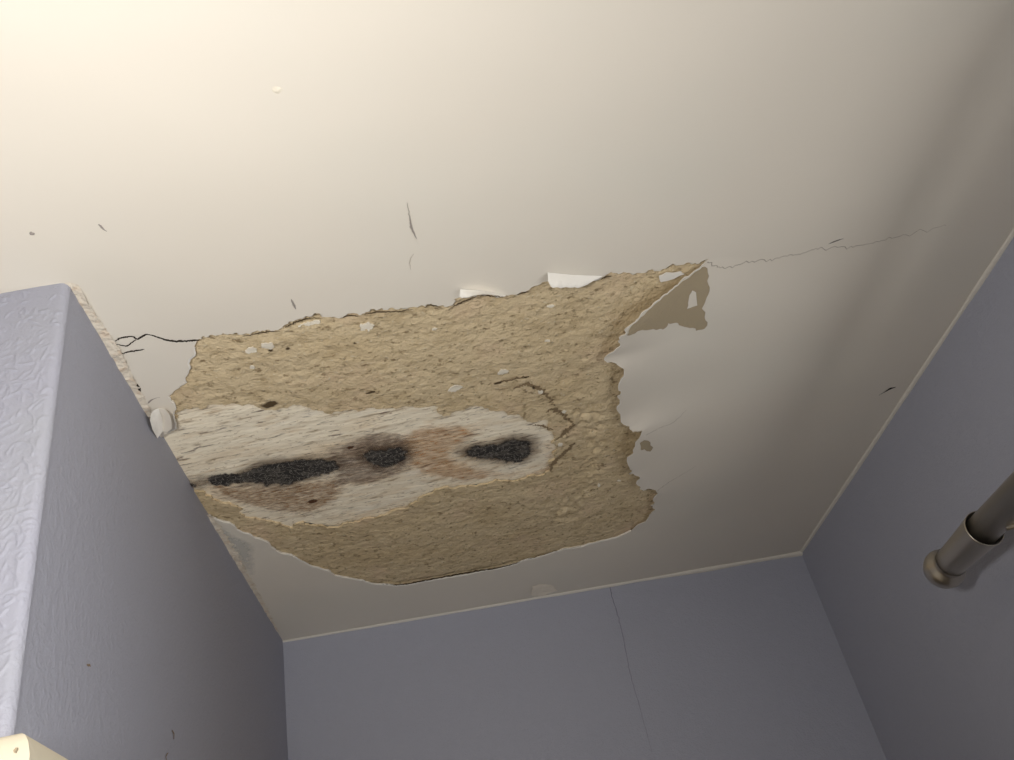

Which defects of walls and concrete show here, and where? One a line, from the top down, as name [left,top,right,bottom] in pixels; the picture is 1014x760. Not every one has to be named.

crack [707,227,937,269]
crack [115,334,199,354]
flaking render [65,259,708,632]
damp [463,438,533,465]
damp [209,434,409,512]